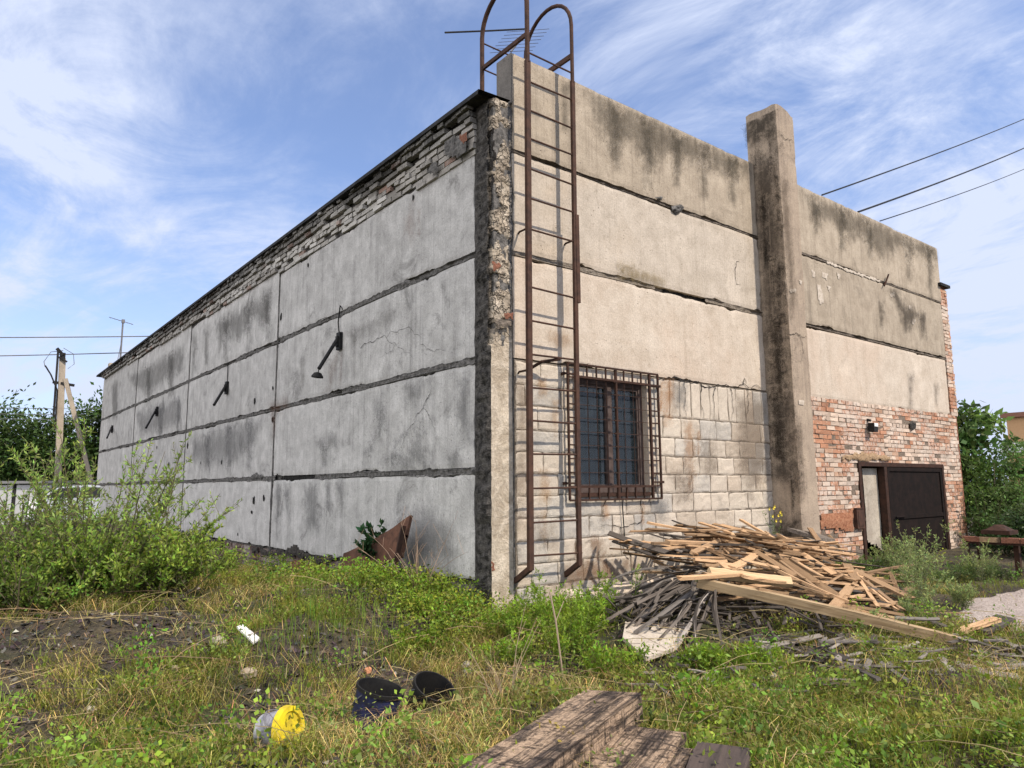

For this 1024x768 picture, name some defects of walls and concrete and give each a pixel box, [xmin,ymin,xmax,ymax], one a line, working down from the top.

water stain [745,111,775,147]
peeling [789,269,840,304]